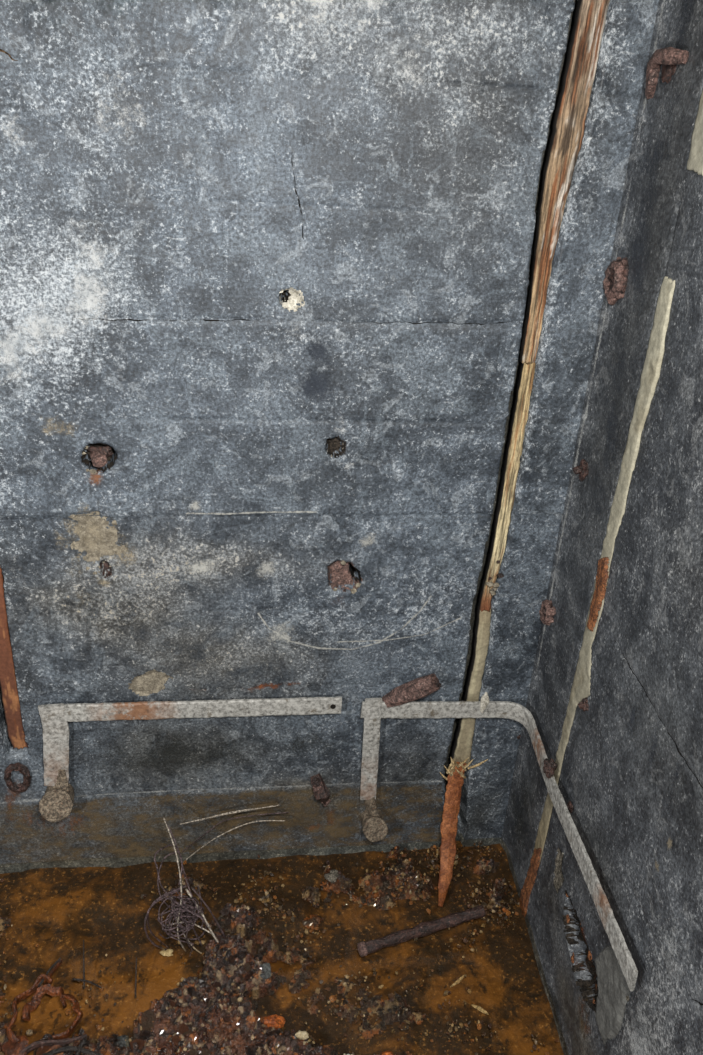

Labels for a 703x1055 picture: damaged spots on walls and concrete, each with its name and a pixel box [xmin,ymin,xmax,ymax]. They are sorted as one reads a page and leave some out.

corrosion [603,257,629,305]
corrosion [587,557,609,632]
corrosion [0,567,28,750]
corrosion [519,848,542,917]
corrosion [357,905,485,957]
corrosion [562,891,599,1013]